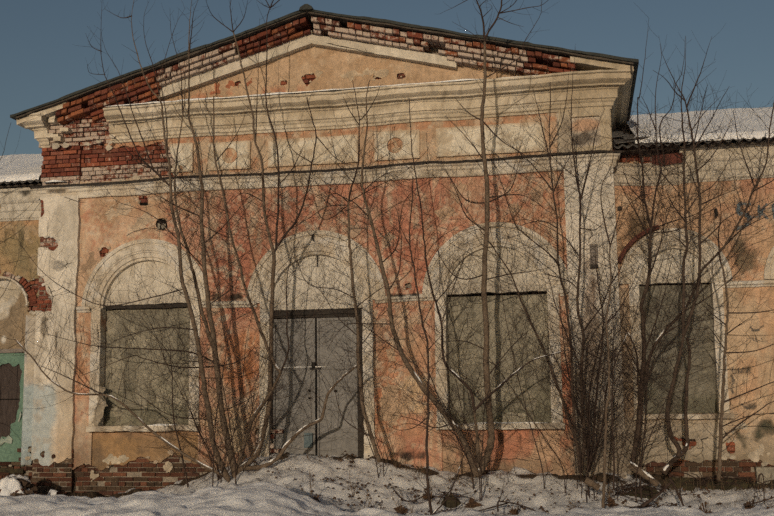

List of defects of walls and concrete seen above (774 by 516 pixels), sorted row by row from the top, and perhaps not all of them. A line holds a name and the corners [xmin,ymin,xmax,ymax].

flaking render [39,17,576,186]
flaking render [40,235,60,251]
peeling [81,246,111,273]
damp [732,241,756,273]
flaking render [0,270,52,315]
damp [756,420,774,439]
flaking render [0,446,211,495]
flaking render [633,423,774,482]